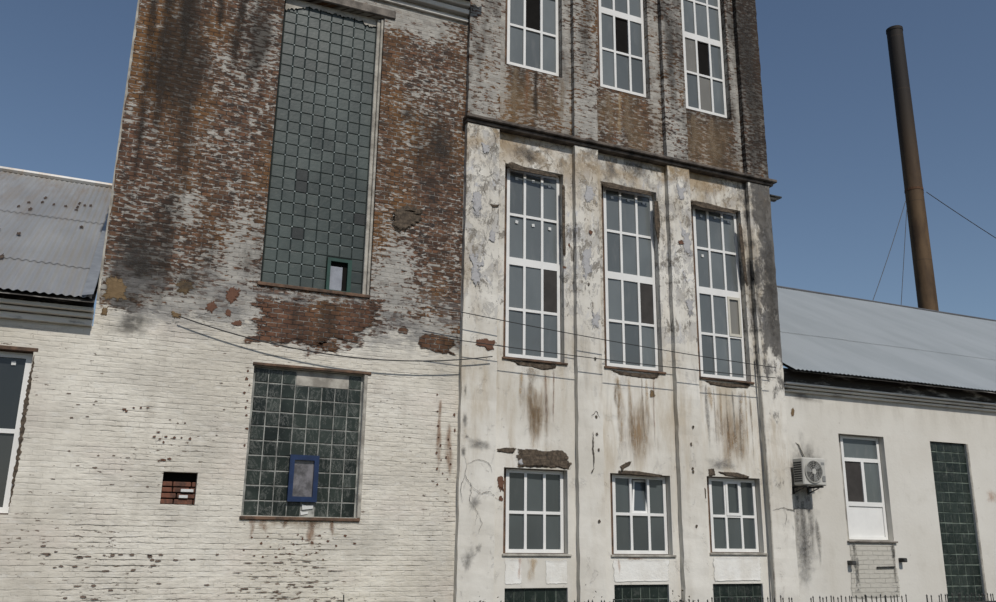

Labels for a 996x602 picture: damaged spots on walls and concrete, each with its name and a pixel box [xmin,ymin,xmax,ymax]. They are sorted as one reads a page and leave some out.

flaking render [176,280,195,295]
flaking render [205,287,389,351]
flaking render [418,333,456,355]
spalling [497,448,572,469]